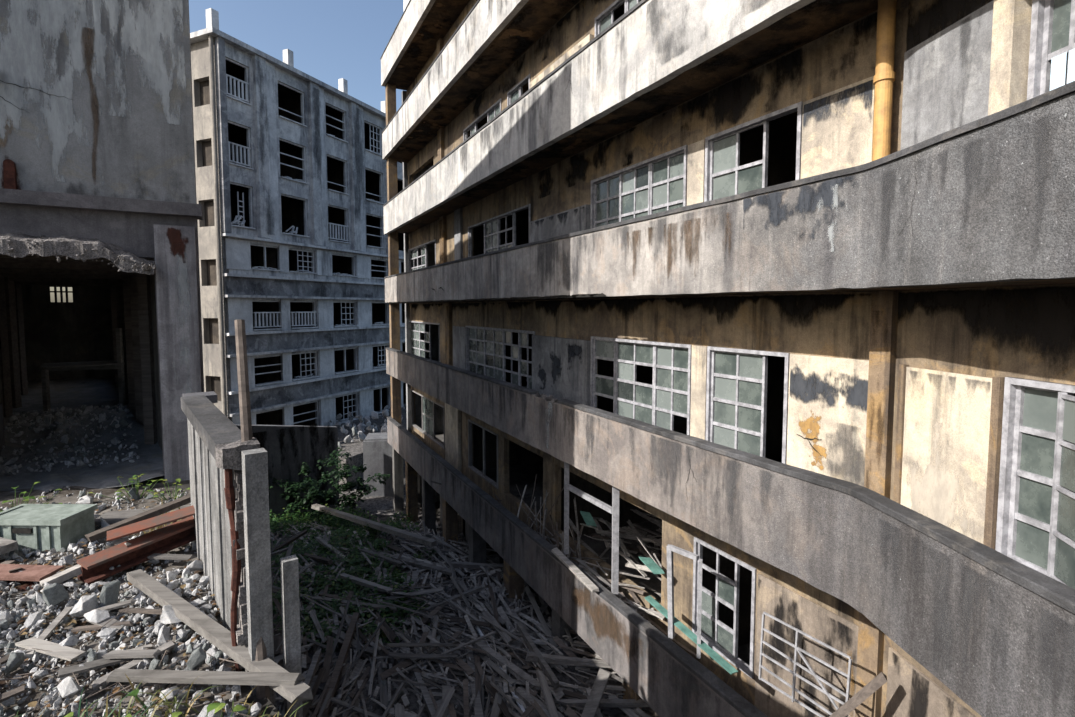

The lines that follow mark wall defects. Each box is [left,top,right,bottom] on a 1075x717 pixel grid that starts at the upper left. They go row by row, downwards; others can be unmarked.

corrosion [82,27,99,180]
peeling [0,0,186,182]
corrosion [166,228,188,263]
water stain [622,214,700,275]
water stain [743,175,855,251]
water stain [411,243,872,327]
water stain [897,286,1075,372]
peeling [798,411,827,470]
water stain [909,671,929,717]